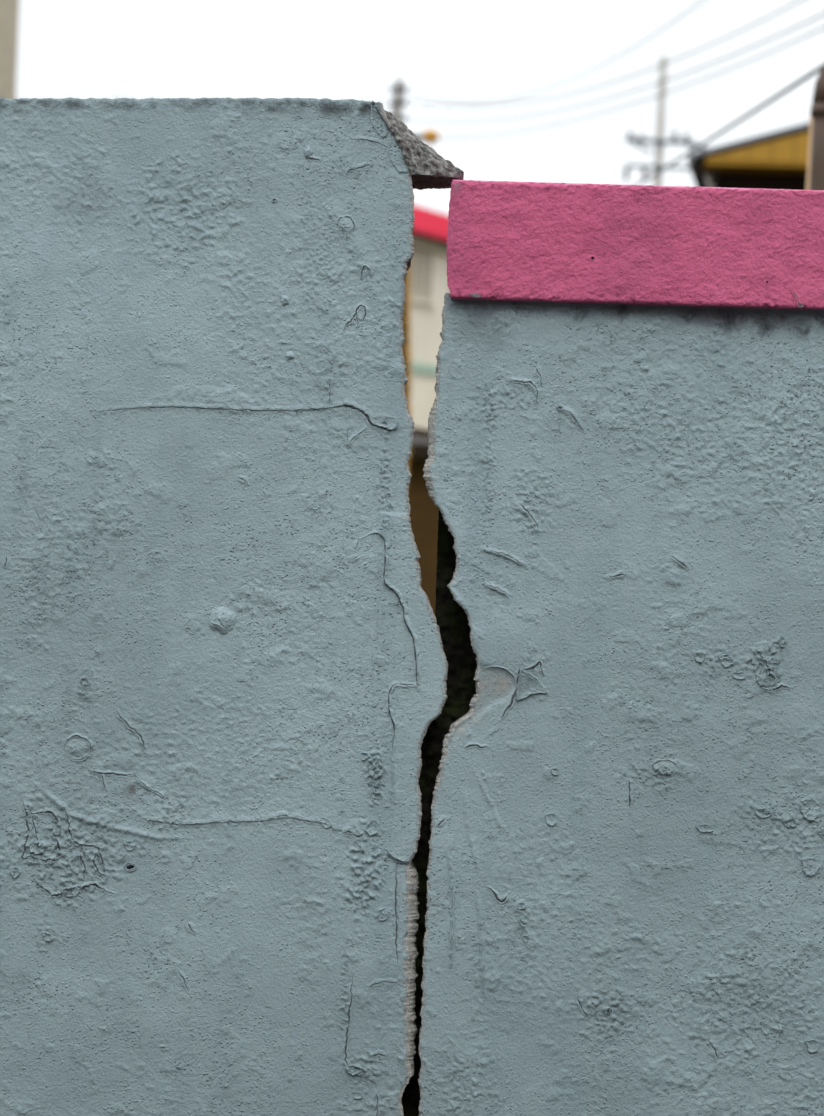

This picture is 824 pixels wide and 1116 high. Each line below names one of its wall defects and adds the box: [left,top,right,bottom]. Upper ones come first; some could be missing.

crack [95,303,398,448]
peeling [346,529,421,794]
spalling [370,100,550,1116]